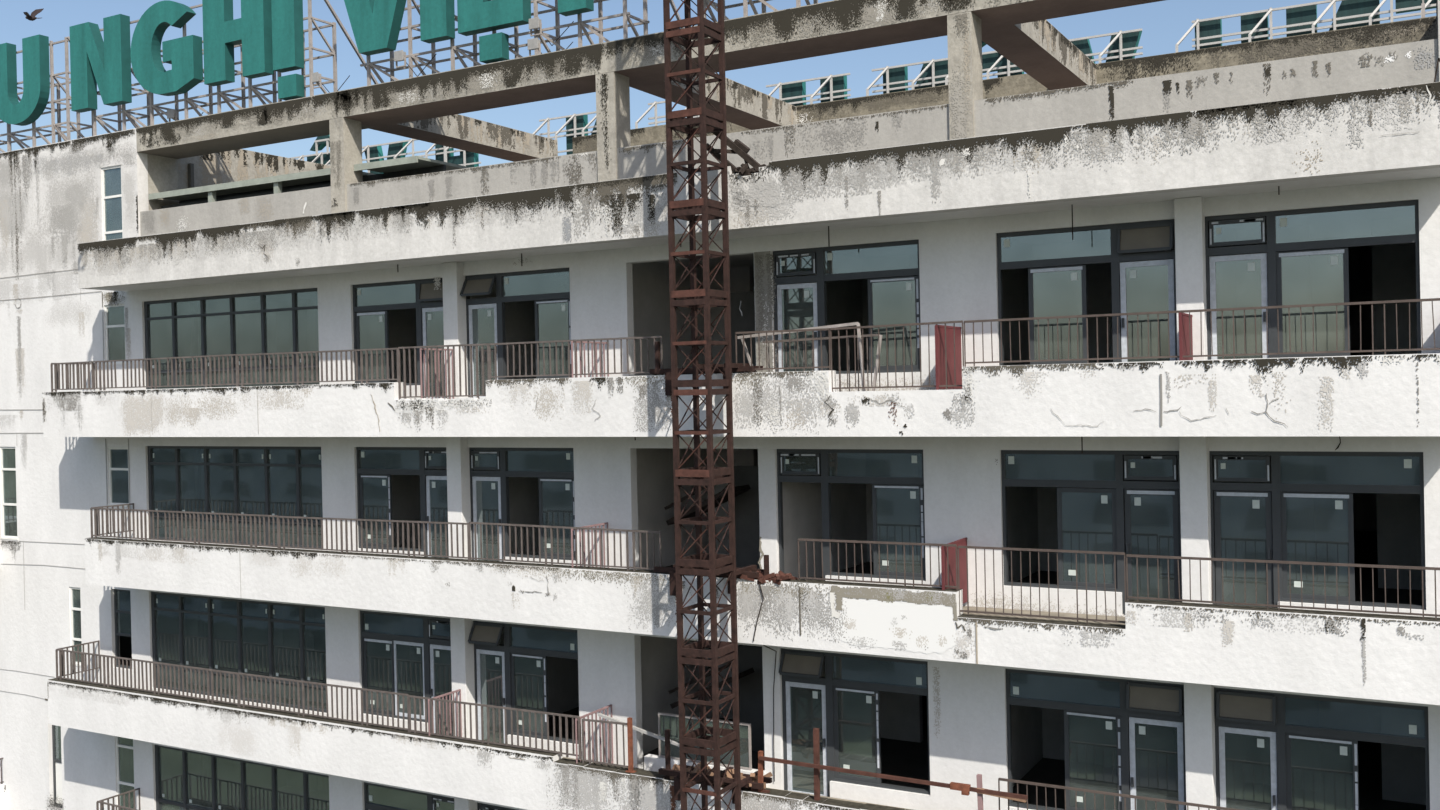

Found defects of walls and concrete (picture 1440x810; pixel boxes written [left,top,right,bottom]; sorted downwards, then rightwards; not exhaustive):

leakage [671,0,1440,226]
leakage [0,0,1028,398]
leakage [733,253,915,435]
leakage [42,378,570,435]
leakage [590,377,672,432]
crack [1051,393,1285,427]
leakage [943,354,1439,428]
leakage [85,539,560,601]
leakage [624,574,692,632]
spalling [737,579,958,621]
leakage [47,681,697,810]